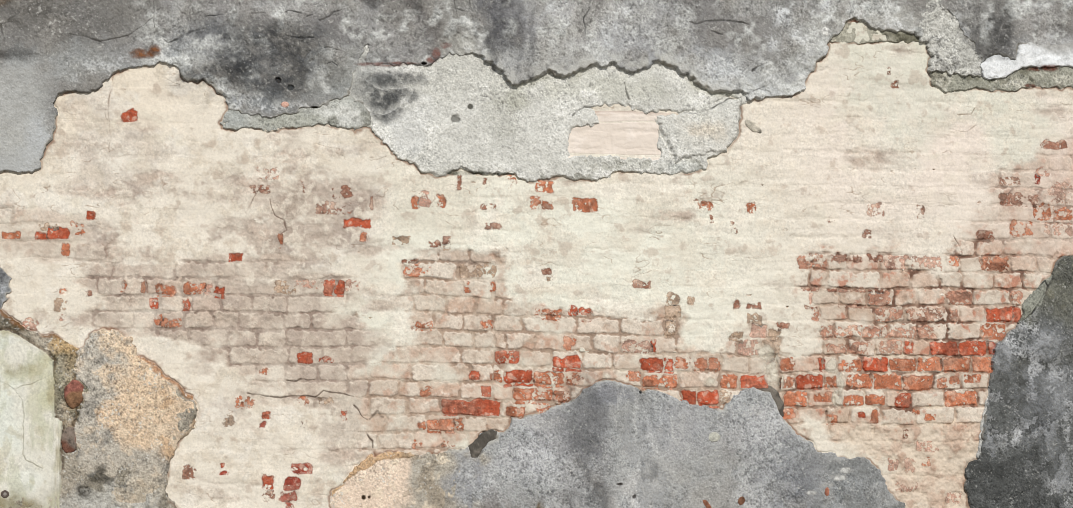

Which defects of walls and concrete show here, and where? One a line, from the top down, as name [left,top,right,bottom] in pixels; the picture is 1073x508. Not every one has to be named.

peeling [121,108,138,123]
spalling [220,45,750,212]
peeling [35,211,96,256]
peeling [316,185,373,242]
peeling [998,167,1073,237]
peeling [797,252,959,271]
spalling [0,267,12,309]
peeling [141,281,225,328]
peeling [622,274,1053,458]
peeling [224,396,271,428]
spalling [330,336,583,508]
peeling [262,463,313,508]